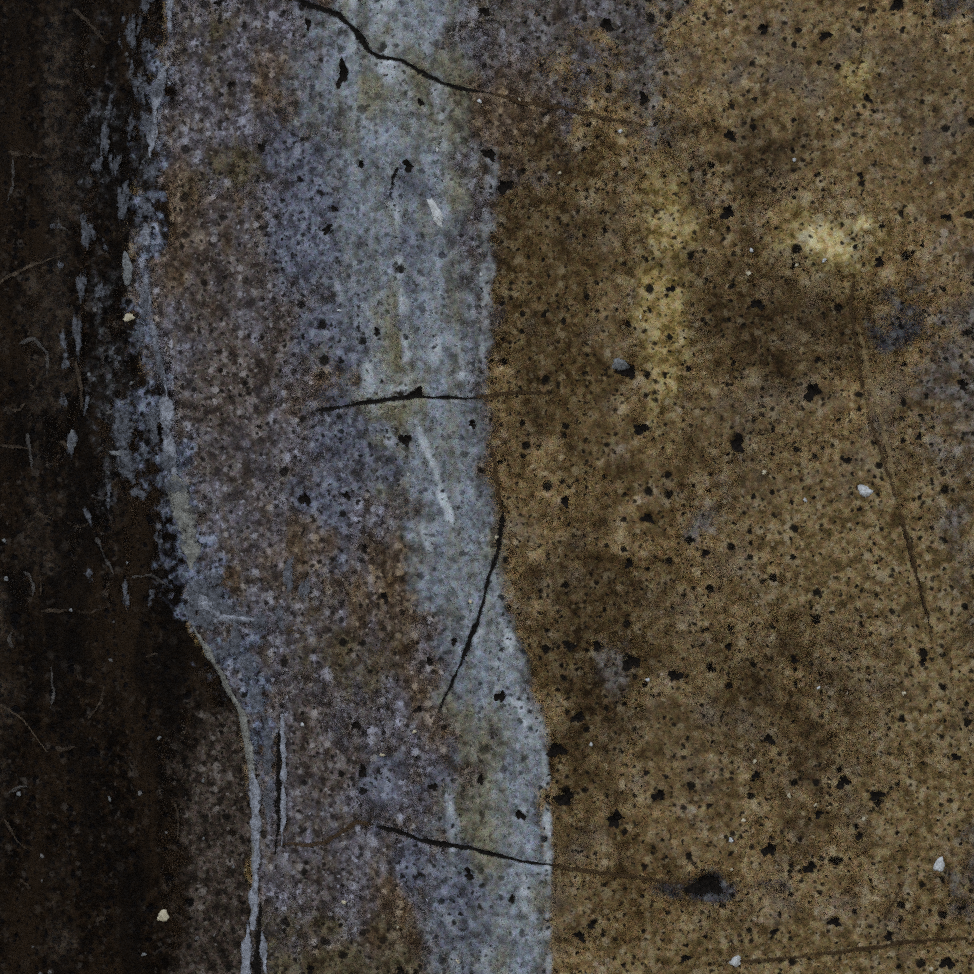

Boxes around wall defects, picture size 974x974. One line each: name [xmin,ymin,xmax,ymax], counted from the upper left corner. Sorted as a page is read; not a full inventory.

crack [291,0,655,127]
damp [0,0,665,974]
crack [315,390,555,412]
crack [440,440,504,708]
crack [274,705,690,885]